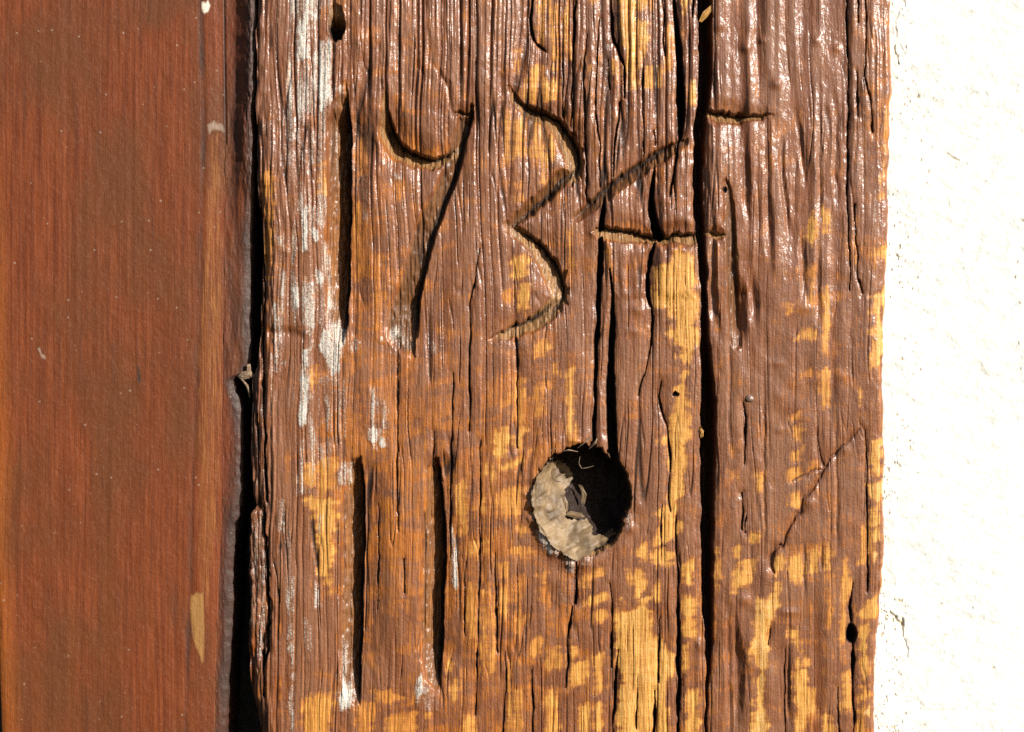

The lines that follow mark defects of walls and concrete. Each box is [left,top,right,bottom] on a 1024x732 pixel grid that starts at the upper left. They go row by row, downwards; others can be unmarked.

peeling [351,200,367,287]
crack [528,0,748,732]
crack [432,247,536,732]
peeling [782,442,822,512]
peeling [442,375,567,732]
peeling [577,539,699,630]
peeling [716,525,793,595]
crack [767,429,870,732]
peeling [854,427,909,659]
peeling [574,645,610,732]
peeling [680,640,705,732]
peeling [819,664,874,732]